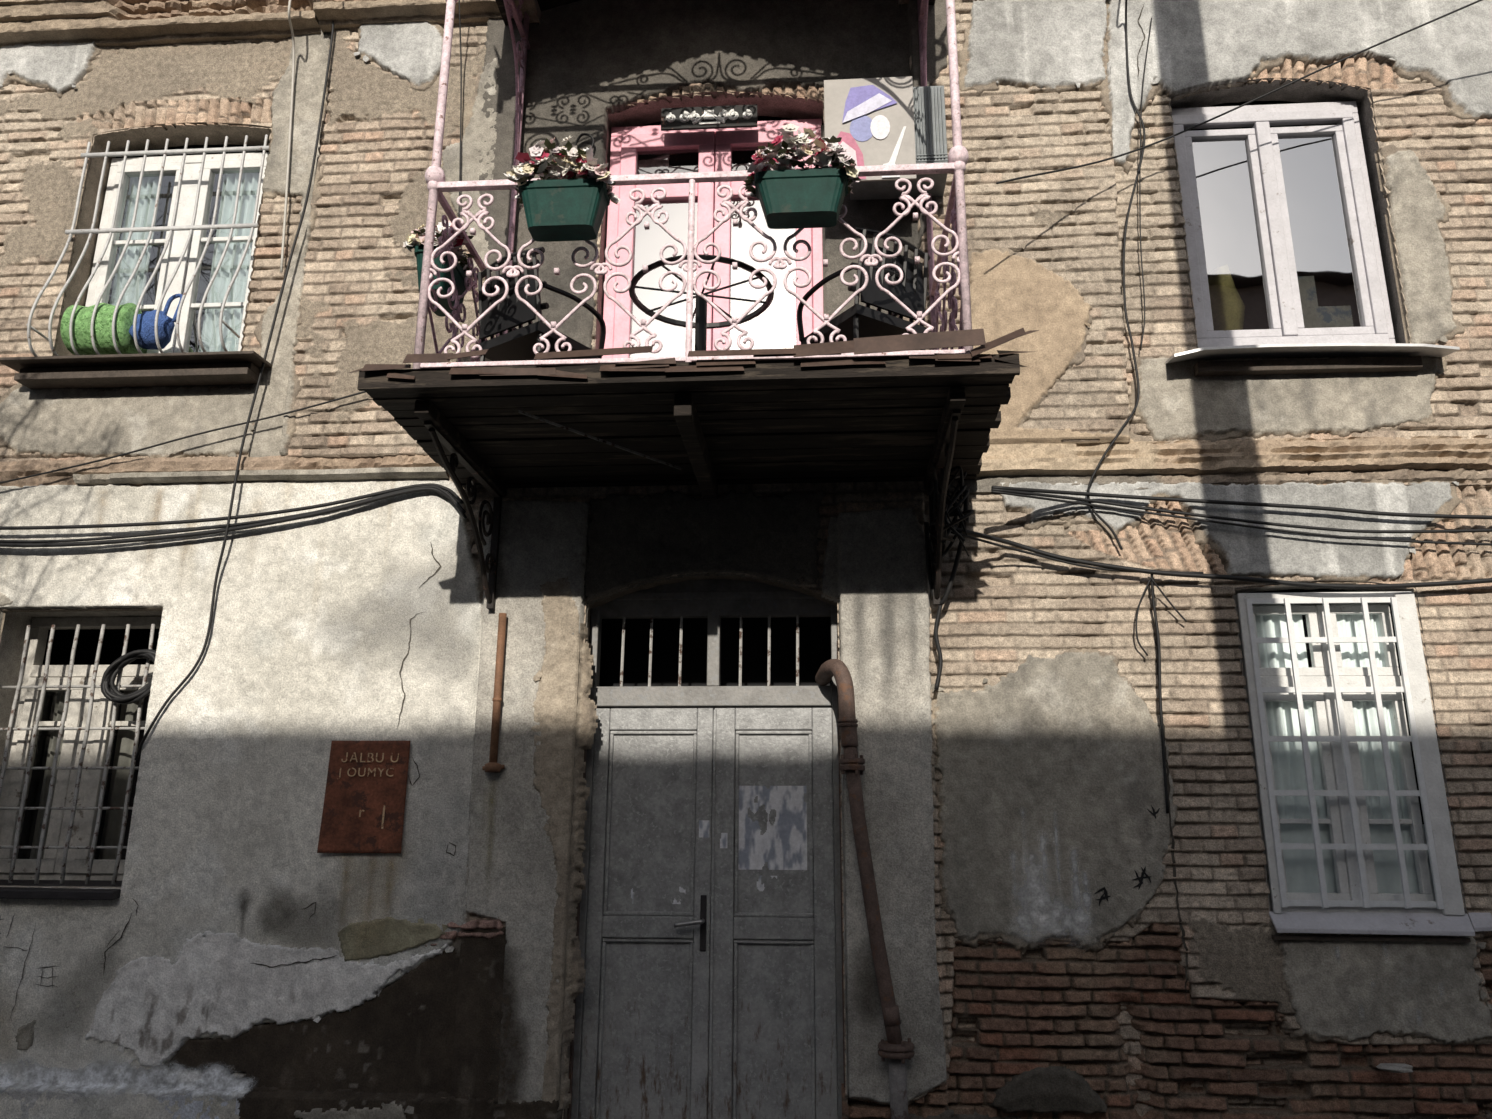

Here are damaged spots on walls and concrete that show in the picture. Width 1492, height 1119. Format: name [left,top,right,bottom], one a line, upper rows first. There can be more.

peeling [0,30,332,459]
peeling [442,0,1492,349]
peeling [968,145,1465,457]
crack [397,544,442,785]
peeling [85,917,504,1067]
peeling [294,1101,414,1119]
spalling [841,923,1492,1119]